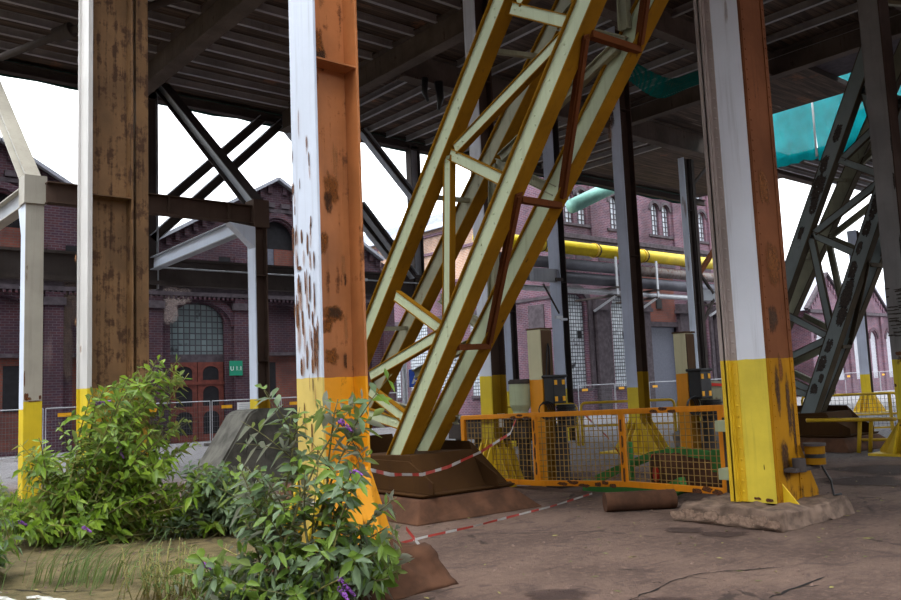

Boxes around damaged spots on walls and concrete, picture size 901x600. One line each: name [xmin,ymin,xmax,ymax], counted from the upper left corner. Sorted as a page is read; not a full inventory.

rust [323,306,344,333]
rust [326,348,347,368]